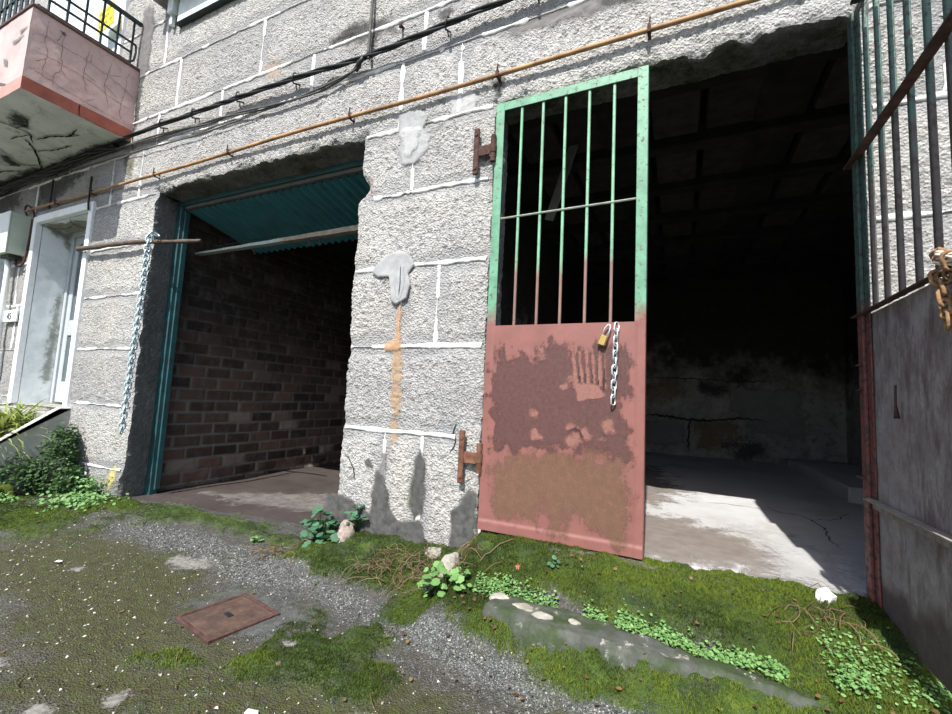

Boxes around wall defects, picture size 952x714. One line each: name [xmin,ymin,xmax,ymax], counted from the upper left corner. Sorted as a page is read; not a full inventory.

crack [0,22,139,173]
corrosion [384,303,402,441]
crack [647,413,769,449]
water stain [198,450,425,544]
water stain [449,489,477,548]
crack [707,502,849,548]